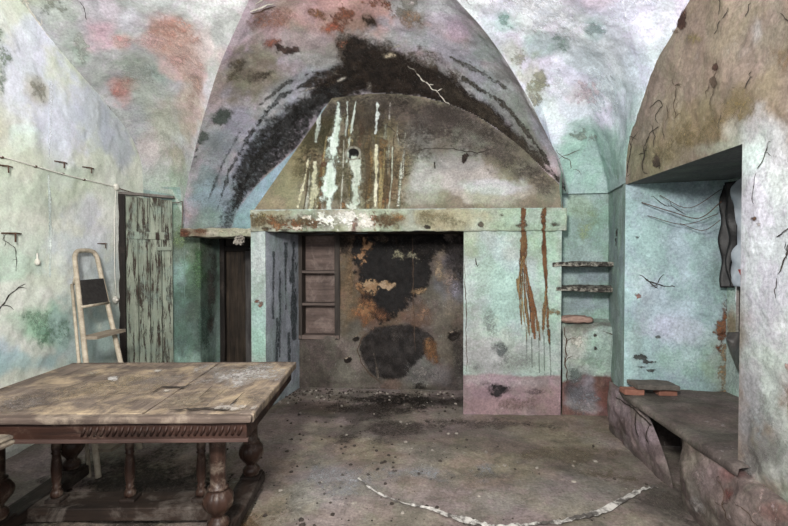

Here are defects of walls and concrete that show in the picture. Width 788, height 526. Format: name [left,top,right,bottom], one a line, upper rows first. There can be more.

spalling [227,59,246,81]
spalling [275,44,300,55]
damp [210,73,416,229]
damp [442,56,566,191]
crack [626,82,682,177]
crack [705,61,721,129]
corrosion [250,212,323,231]
crack [0,284,25,310]
corrosion [516,207,560,345]
crack [774,228,788,298]